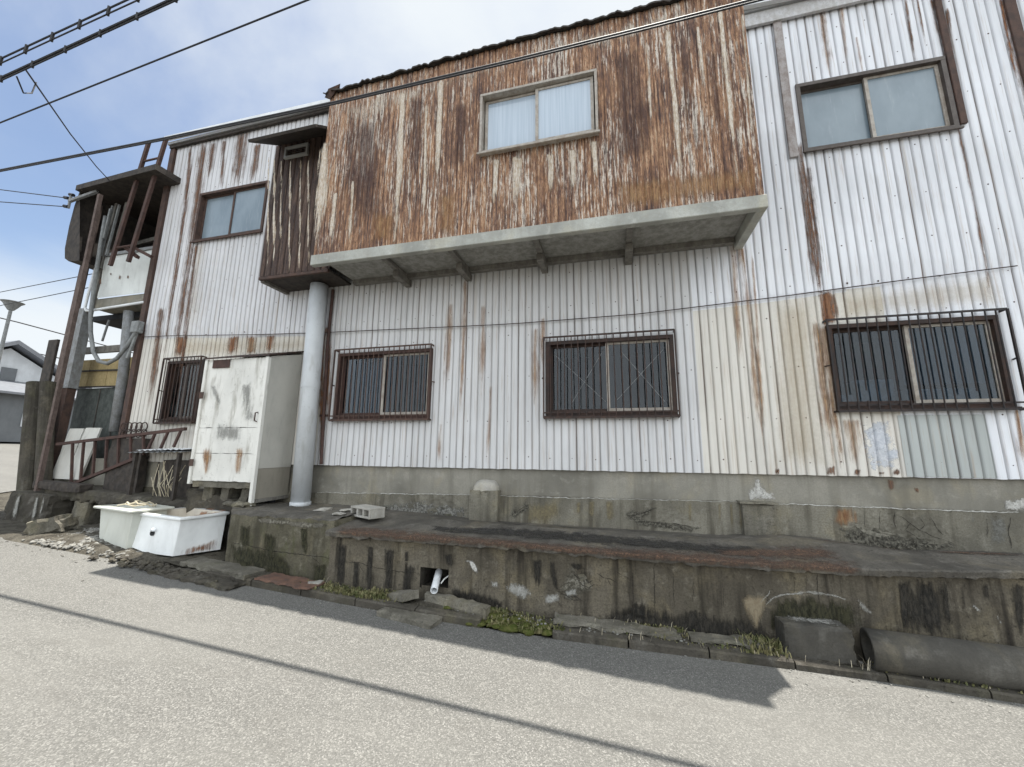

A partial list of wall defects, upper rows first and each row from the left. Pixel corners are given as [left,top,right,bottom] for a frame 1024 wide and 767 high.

rust [149,133,260,399]
rust [798,147,856,456]
rust [229,336,274,353]
rust [447,283,466,384]
rust [733,246,763,423]
leakage [231,526,290,575]
leakage [313,546,414,590]
leakage [452,589,502,609]
leakage [532,560,558,589]
leakage [606,591,868,640]
crack [864,514,952,543]
leakage [899,580,950,635]